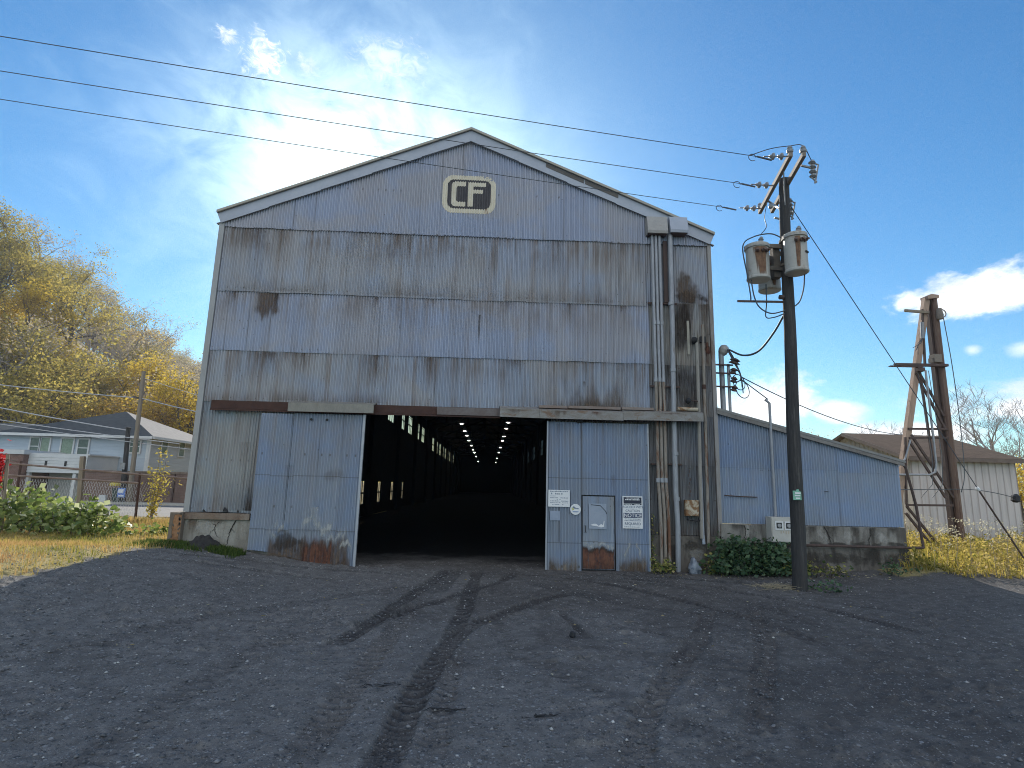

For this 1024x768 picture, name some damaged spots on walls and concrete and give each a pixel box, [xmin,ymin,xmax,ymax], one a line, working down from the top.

corrosion [257,293,278,318]
corrosion [301,519,349,566]
corrosion [551,543,646,572]